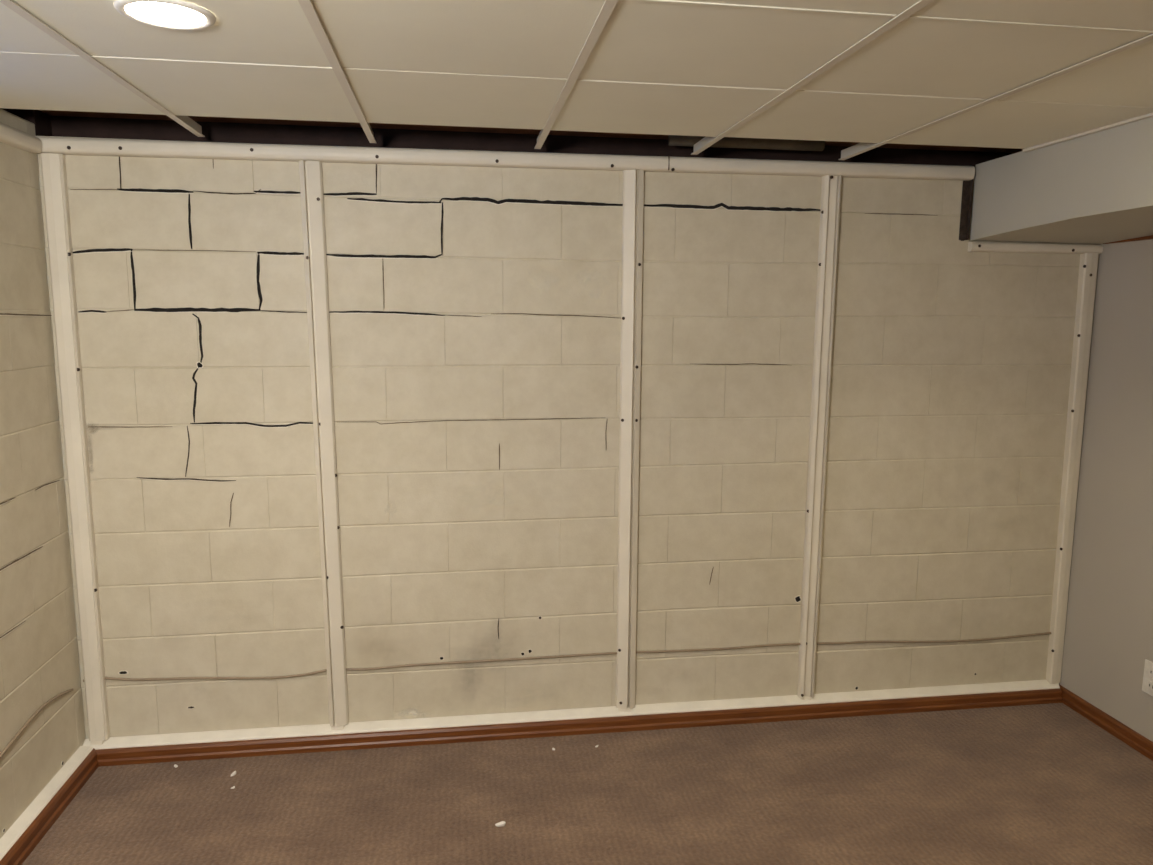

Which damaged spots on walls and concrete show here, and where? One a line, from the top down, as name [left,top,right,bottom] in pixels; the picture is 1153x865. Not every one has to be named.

crack [0,156,821,527]
crack [0,546,43,572]